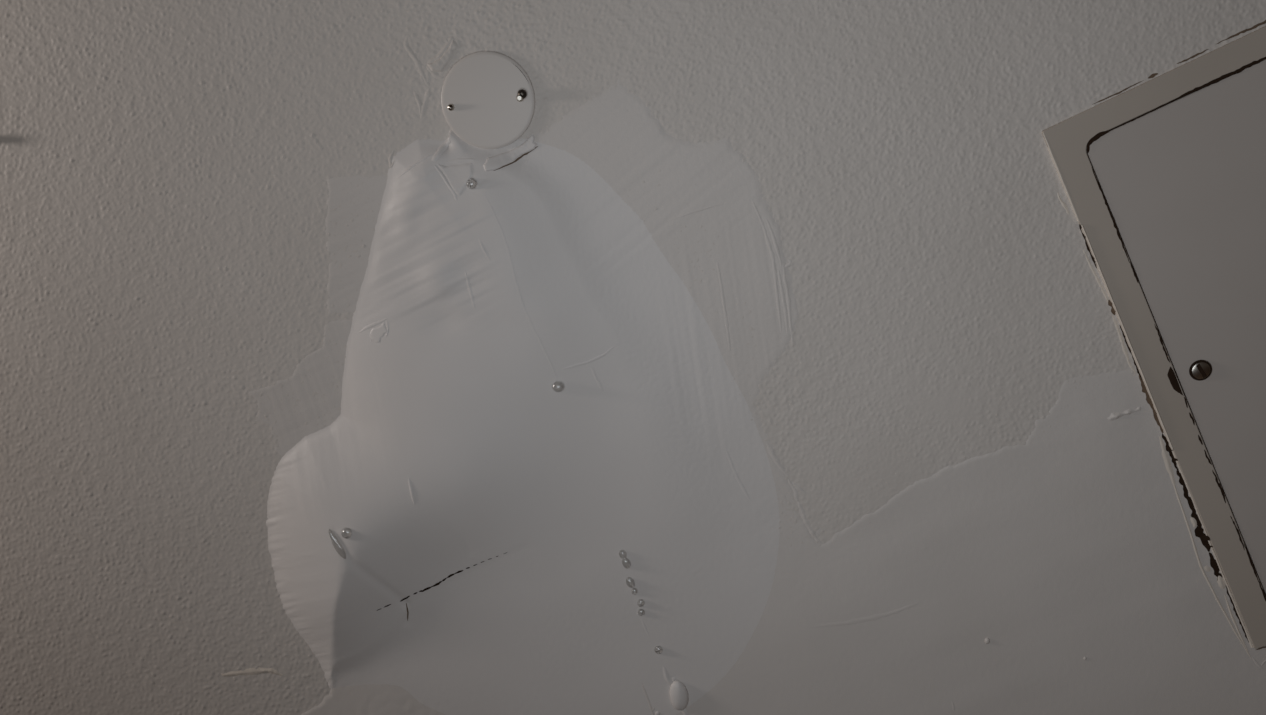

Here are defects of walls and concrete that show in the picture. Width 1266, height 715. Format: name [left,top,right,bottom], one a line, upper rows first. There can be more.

crack [377,552,507,621]
crack [1043,20,1266,659]